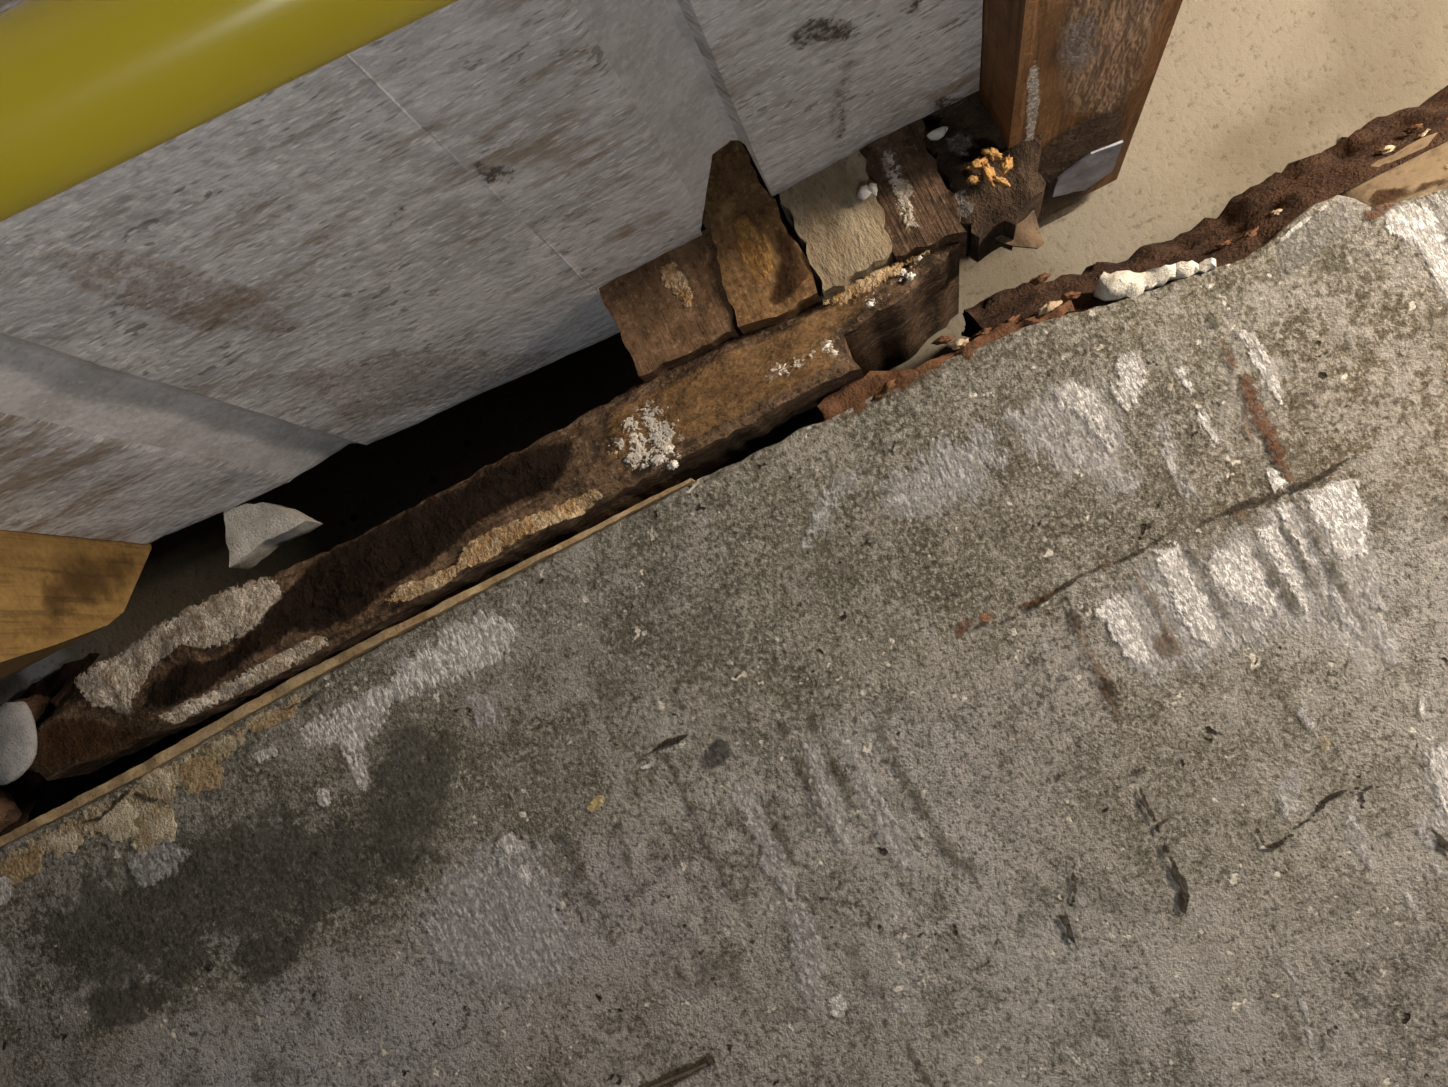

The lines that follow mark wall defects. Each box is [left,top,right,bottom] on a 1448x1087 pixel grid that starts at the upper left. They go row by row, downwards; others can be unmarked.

corrosion [1218,339,1293,482]
crack [974,459,1349,629]
damp [30,609,616,1026]
damp [664,753,739,898]
damp [732,774,849,1021]
damp [779,717,925,882]
damp [877,725,977,874]
crack [1130,767,1190,914]
crack [1254,785,1379,848]